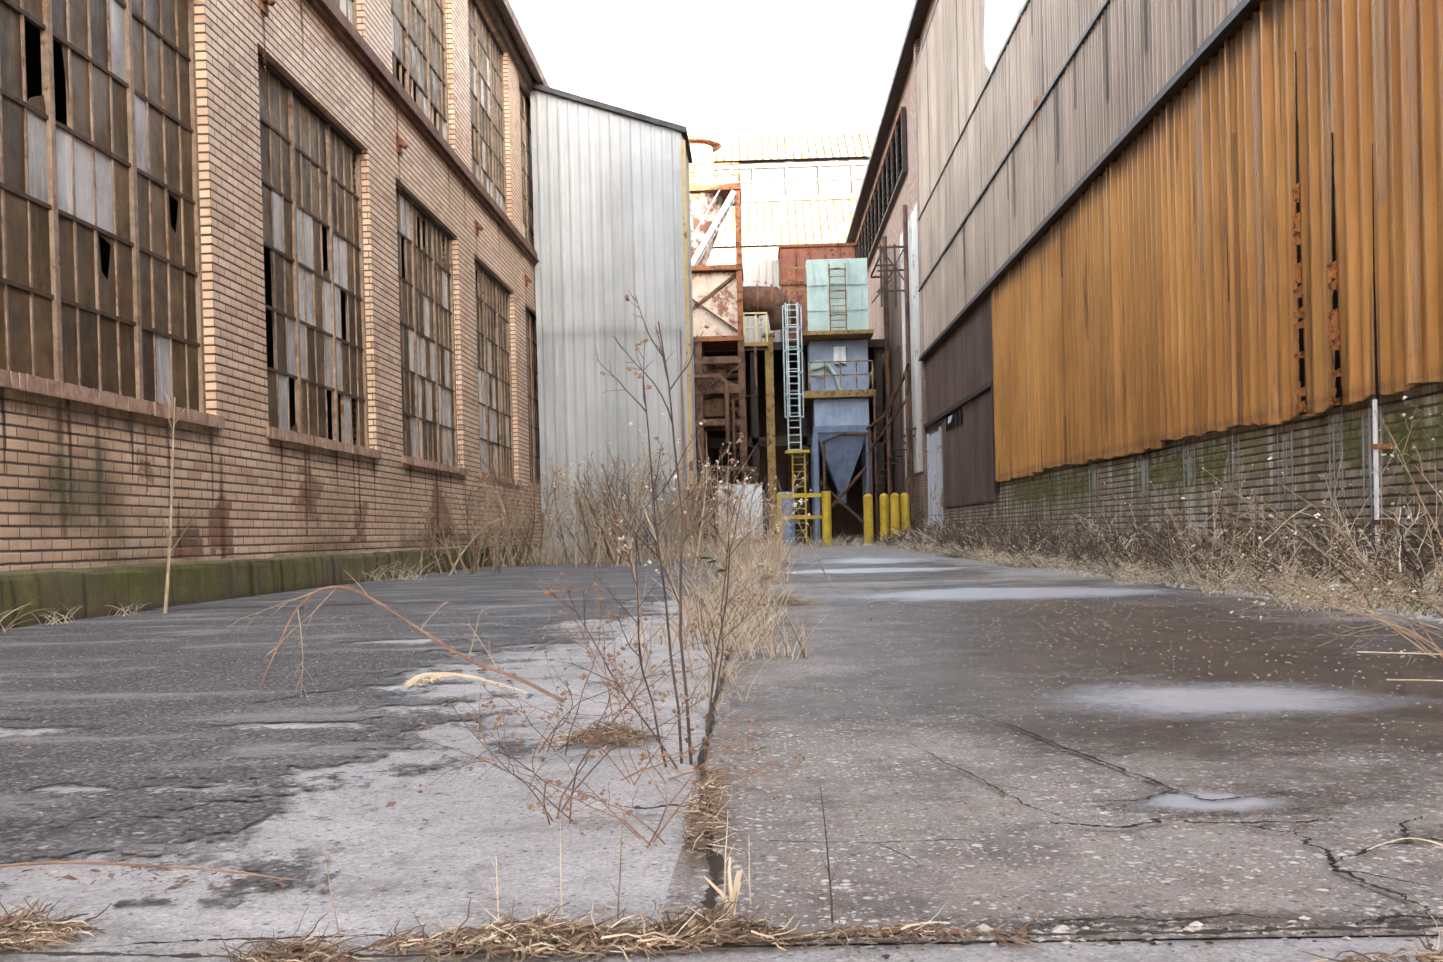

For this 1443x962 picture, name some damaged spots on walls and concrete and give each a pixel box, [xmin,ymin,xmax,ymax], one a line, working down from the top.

crack [0,586,1443,961]